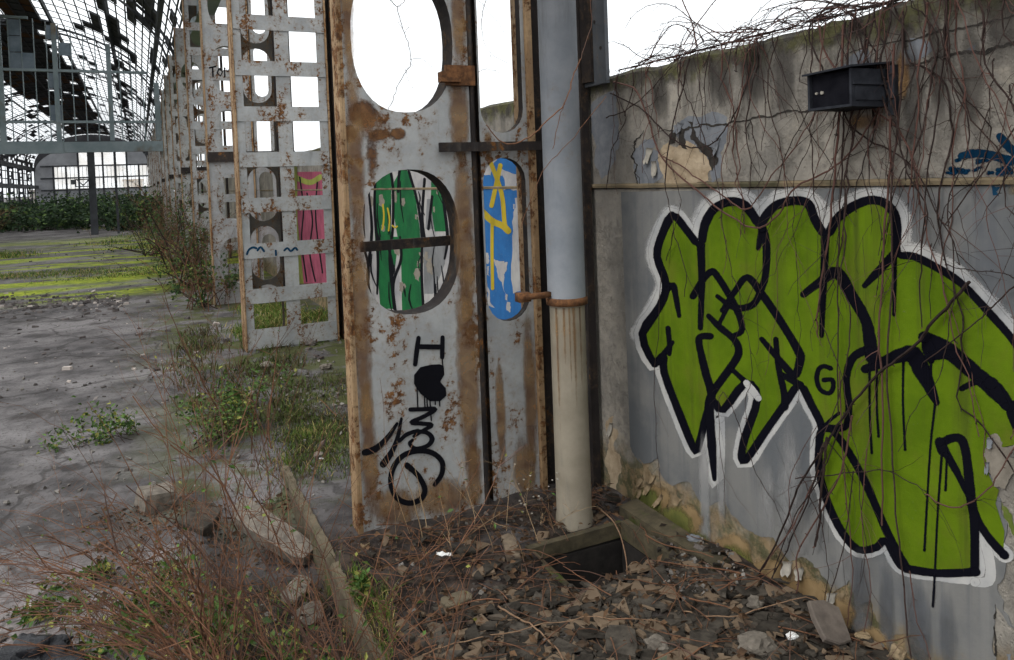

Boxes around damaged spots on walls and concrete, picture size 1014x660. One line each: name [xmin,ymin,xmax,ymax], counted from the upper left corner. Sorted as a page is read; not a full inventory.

corrosion [341,0,354,69]
corrosion [452,0,465,57]
flaking render [633,111,728,184]
corrosion [346,84,481,526]
corrosion [555,307,582,388]
corrosion [496,322,537,492]
flaking render [605,416,622,490]
spalling [525,459,731,588]
spalling [780,560,805,581]